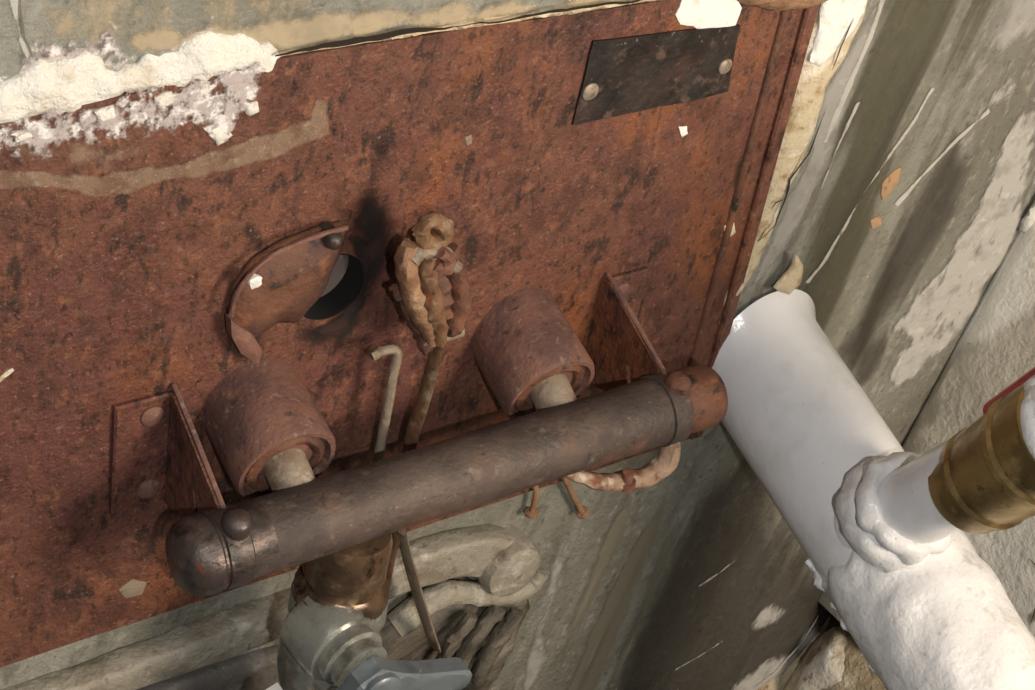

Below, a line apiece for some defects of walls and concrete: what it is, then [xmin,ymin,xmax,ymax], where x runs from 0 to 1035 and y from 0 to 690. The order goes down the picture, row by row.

spalling [754,605,783,628]
crack [1027,609,1035,622]
spalling [733,614,886,690]